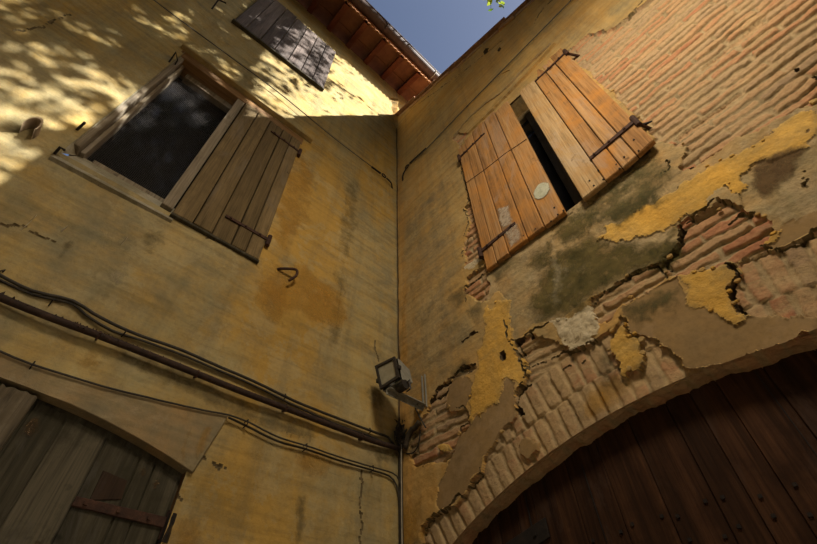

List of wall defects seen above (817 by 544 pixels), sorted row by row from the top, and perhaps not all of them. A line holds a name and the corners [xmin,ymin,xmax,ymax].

water stain [753,147,803,196]
flaking render [410,0,817,544]
water stain [549,305,600,351]
crack [357,469,365,544]